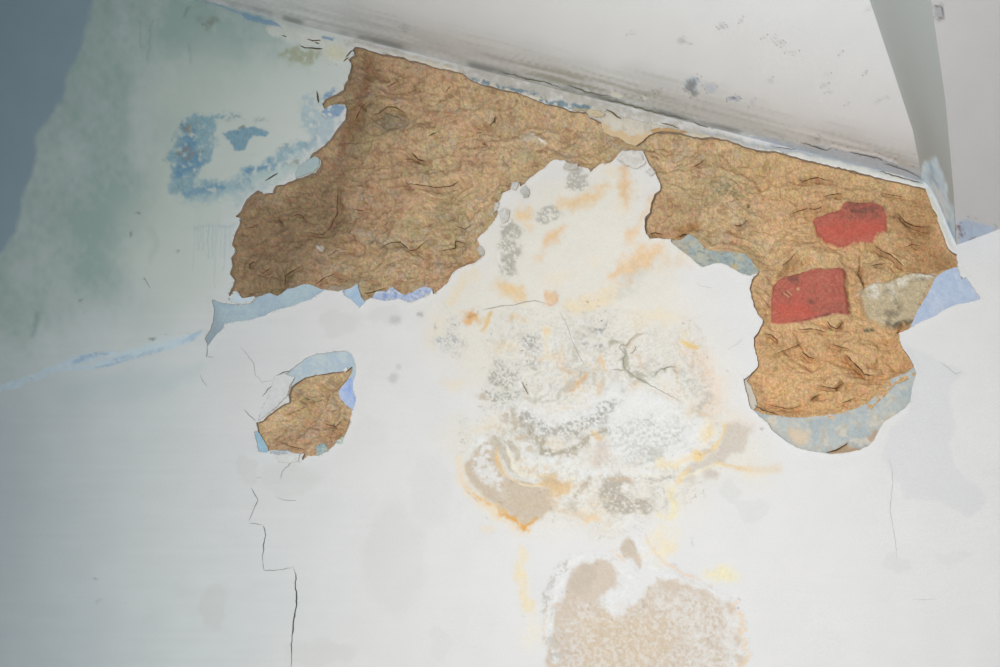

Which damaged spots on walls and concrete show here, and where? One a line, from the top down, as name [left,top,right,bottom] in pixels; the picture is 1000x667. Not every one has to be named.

crack [249,462,300,664]
spalling [162,0,998,467]
water stain [397,154,785,667]